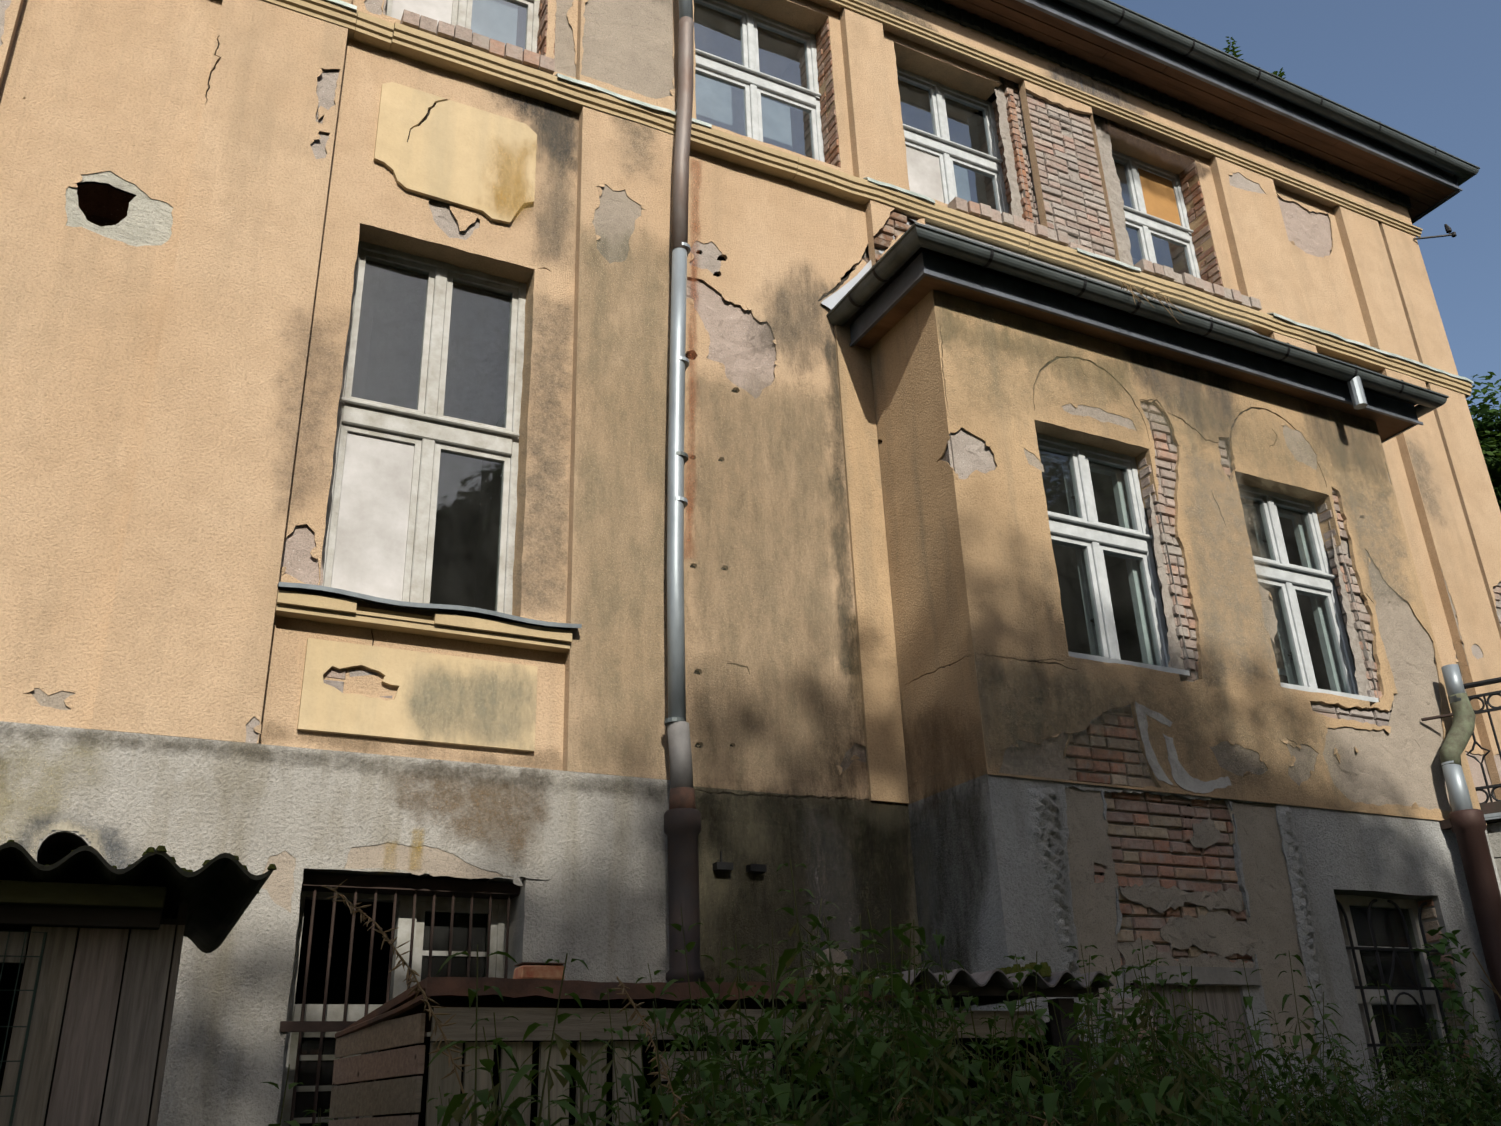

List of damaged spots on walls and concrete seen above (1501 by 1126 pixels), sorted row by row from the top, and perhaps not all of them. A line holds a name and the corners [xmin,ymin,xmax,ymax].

crack [407,103,436,142]
flaking render [65,171,173,247]
flaking render [685,240,779,399]
damp [754,286,861,681]
flaking render [940,428,997,480]
flaking render [323,668,379,693]
flaking render [1258,583,1278,644]
flaking render [1280,490,1483,811]
flaking render [1465,751,1501,803]
damp [20,820,128,869]
damp [695,784,987,985]
flaking render [1065,787,1316,1053]